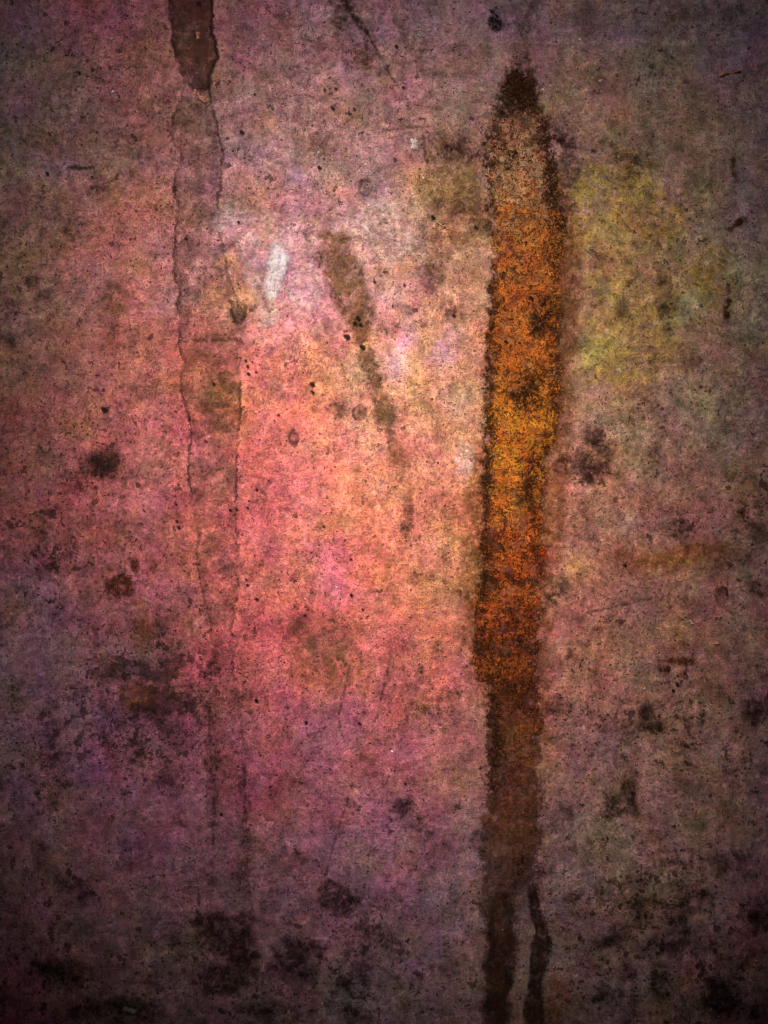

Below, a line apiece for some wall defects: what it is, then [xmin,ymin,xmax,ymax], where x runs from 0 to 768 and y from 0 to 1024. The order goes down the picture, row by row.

water stain [169,0,219,98]
water stain [315,232,407,483]
rust [461,67,580,1024]
water stain [198,913,257,994]